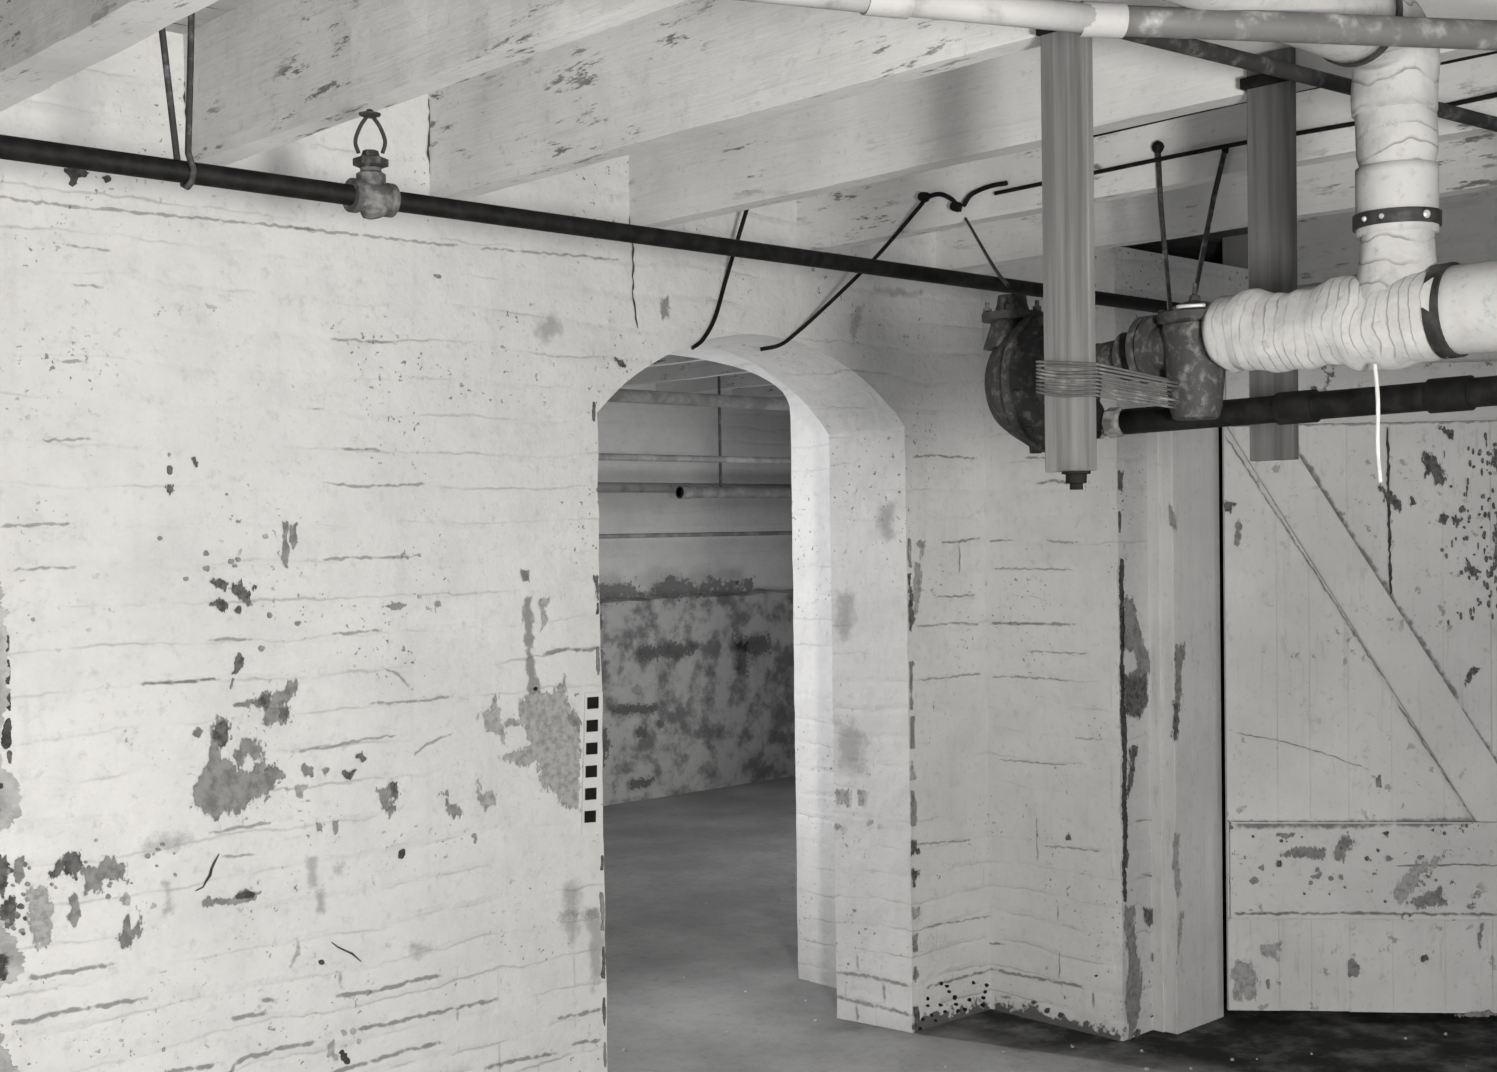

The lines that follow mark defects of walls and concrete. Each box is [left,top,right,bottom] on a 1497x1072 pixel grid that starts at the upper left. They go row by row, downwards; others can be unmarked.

peeling [1421,425,1497,625]
flaking render [0,581,23,831]
peeling [190,645,367,821]
peeling [476,673,583,813]
damp [602,703,664,767]
damp [630,777,655,790]
damp [638,640,701,662]
damp [599,574,754,654]
damp [732,633,772,676]
spalling [1119,558,1153,1040]
peeling [0,838,144,988]
peeling [1250,829,1448,911]